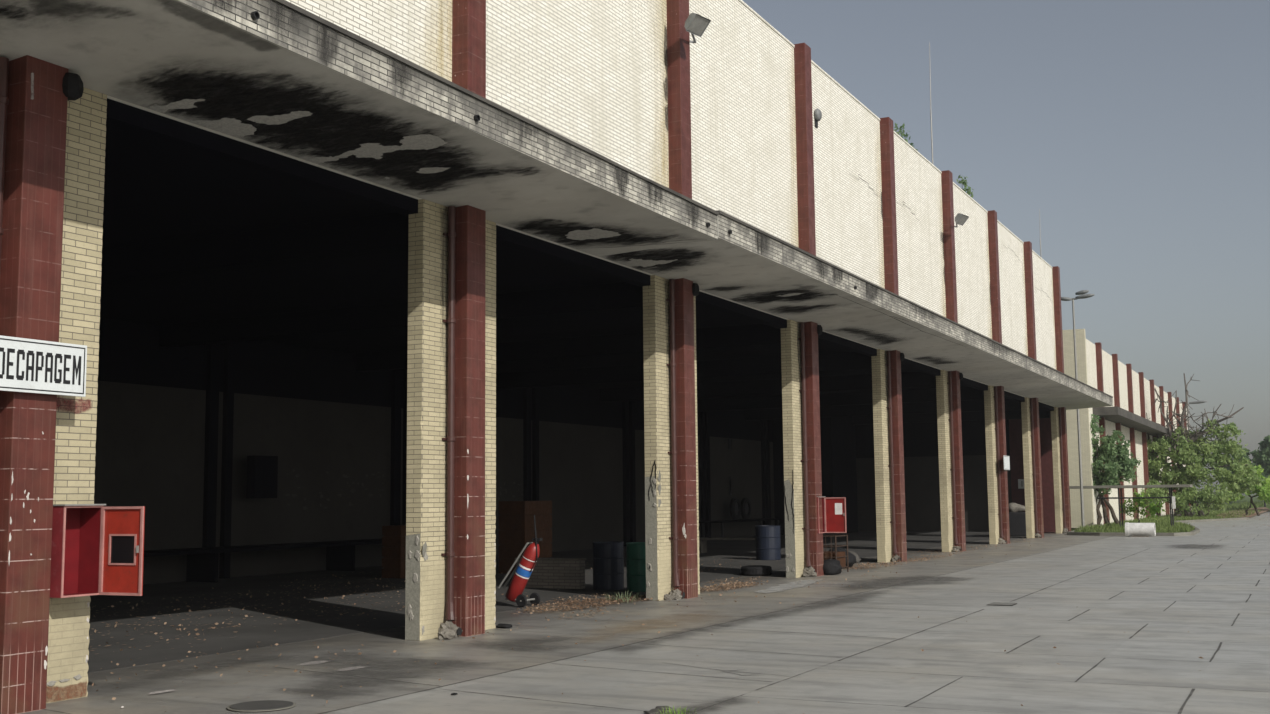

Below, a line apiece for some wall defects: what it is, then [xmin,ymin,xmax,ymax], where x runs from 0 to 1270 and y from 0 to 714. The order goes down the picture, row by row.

leakage [143,69,538,192]
leakage [516,219,704,283]
leakage [709,287,834,313]